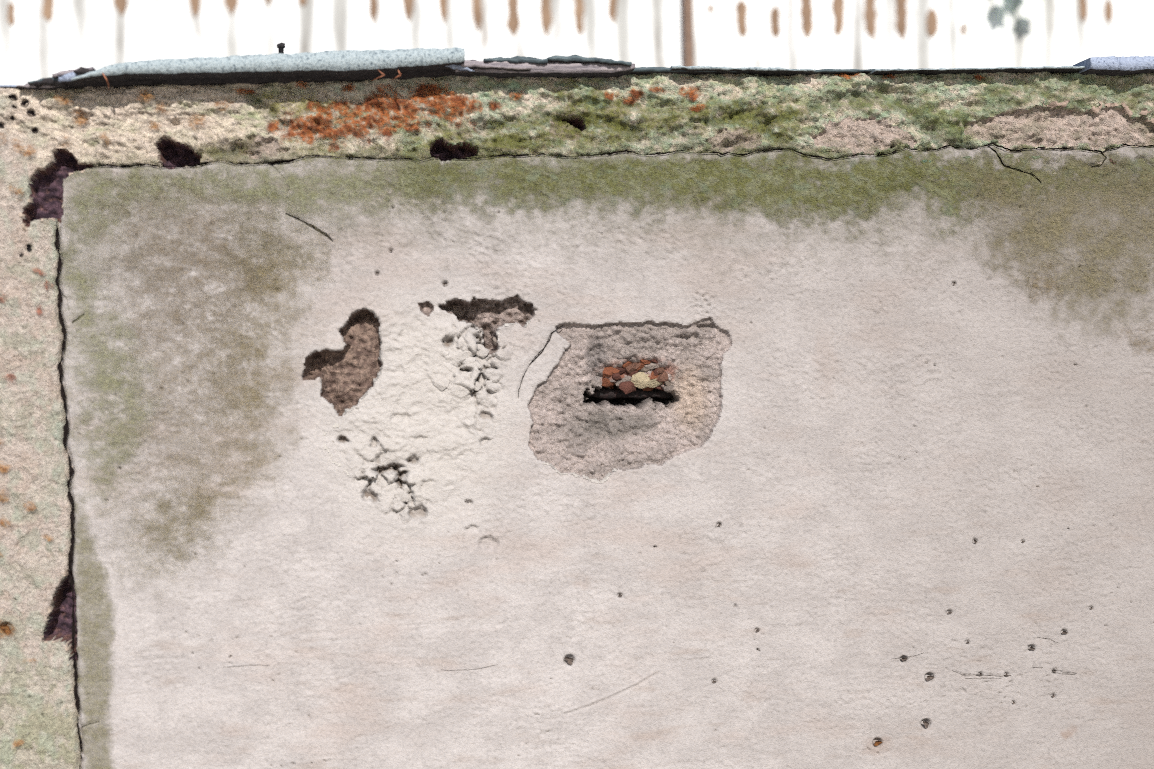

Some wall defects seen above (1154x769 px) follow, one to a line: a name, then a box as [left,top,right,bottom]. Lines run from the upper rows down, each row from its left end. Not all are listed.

rust [267,84,500,151]
rust [605,87,664,105]
rust [679,88,705,111]
crack [96,142,1154,182]
peeling [19,196,33,257]
crack [286,213,333,241]
water stain [983,172,1154,314]
crack [518,325,563,398]
flaking render [302,295,535,530]
spalling [527,316,732,483]
crack [55,221,98,769]
peeling [40,569,72,666]